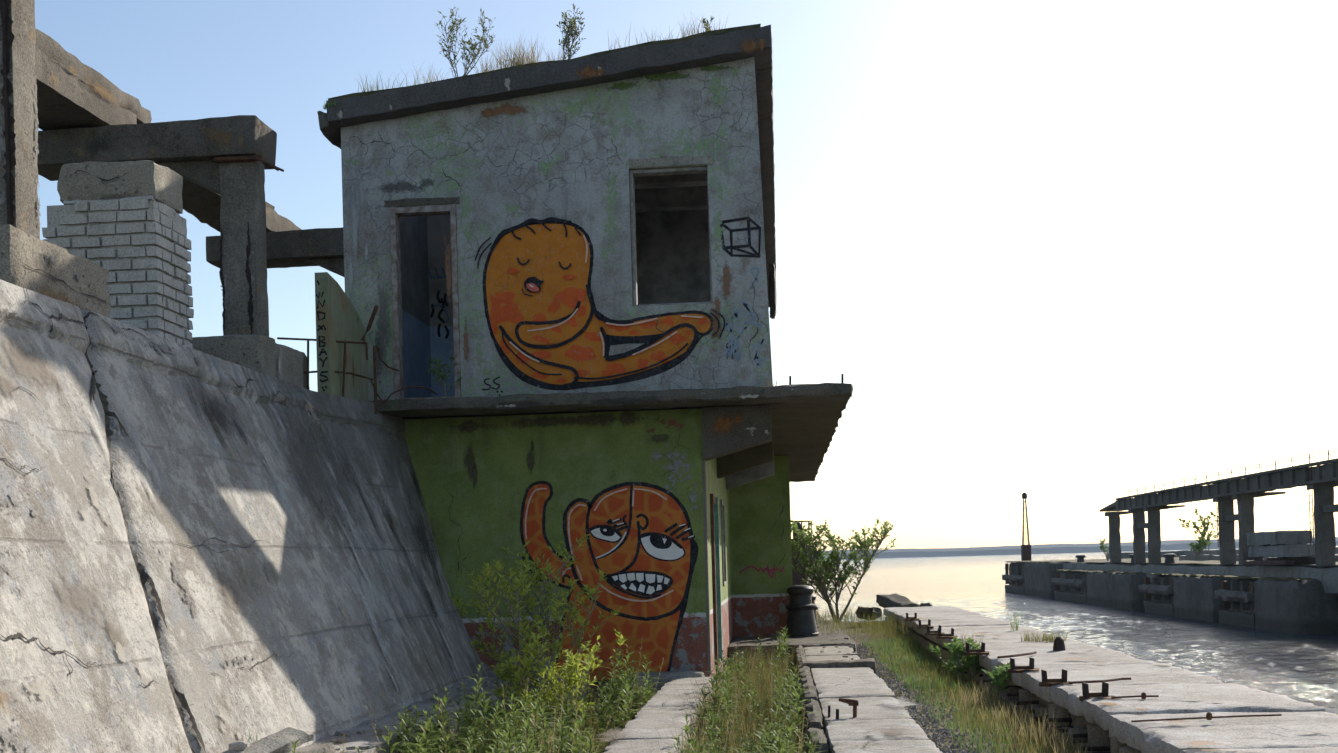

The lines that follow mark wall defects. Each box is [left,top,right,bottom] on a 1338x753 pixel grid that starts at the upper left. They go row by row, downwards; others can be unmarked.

corrosion [481,103,529,117]
crack [0,259,307,753]